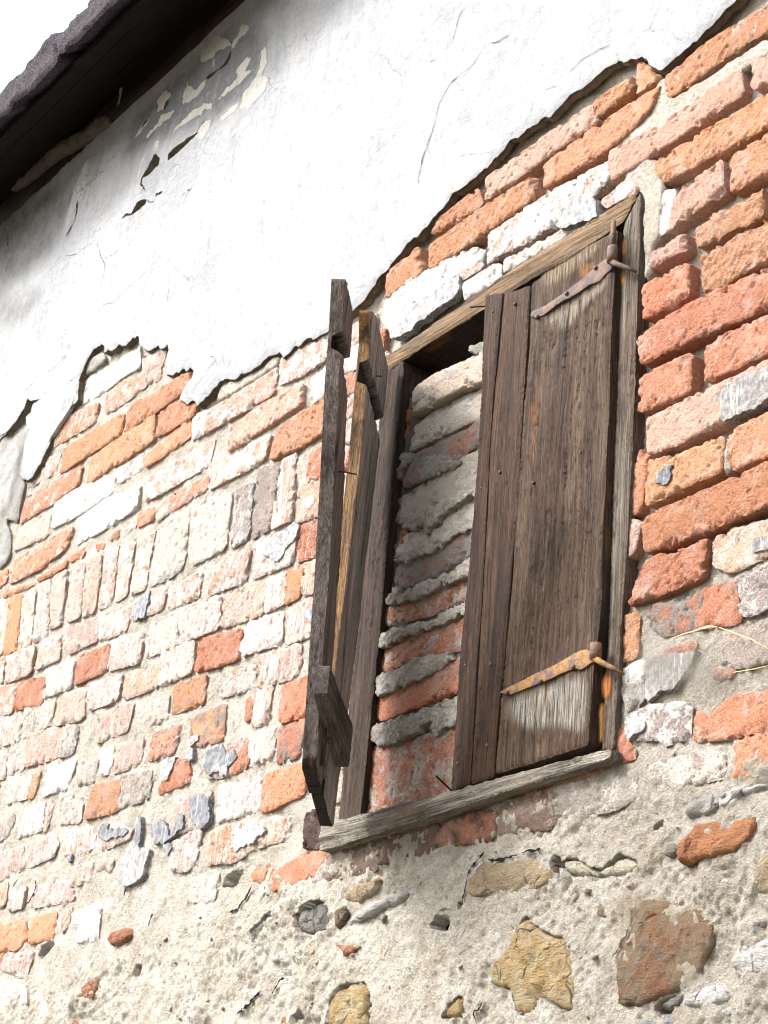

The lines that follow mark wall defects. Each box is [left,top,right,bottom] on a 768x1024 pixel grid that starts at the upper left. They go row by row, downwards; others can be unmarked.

peeling [135,47,269,189]
crack [417,36,506,184]
flaking render [352,0,748,319]
peeling [389,275,465,341]
flaking render [71,331,329,414]
peeling [716,366,768,427]
flaking render [20,425,63,482]
peeling [261,522,301,562]
peeling [644,650,701,704]
peeling [159,734,238,781]
peeling [98,794,214,887]
crack [462,846,541,901]